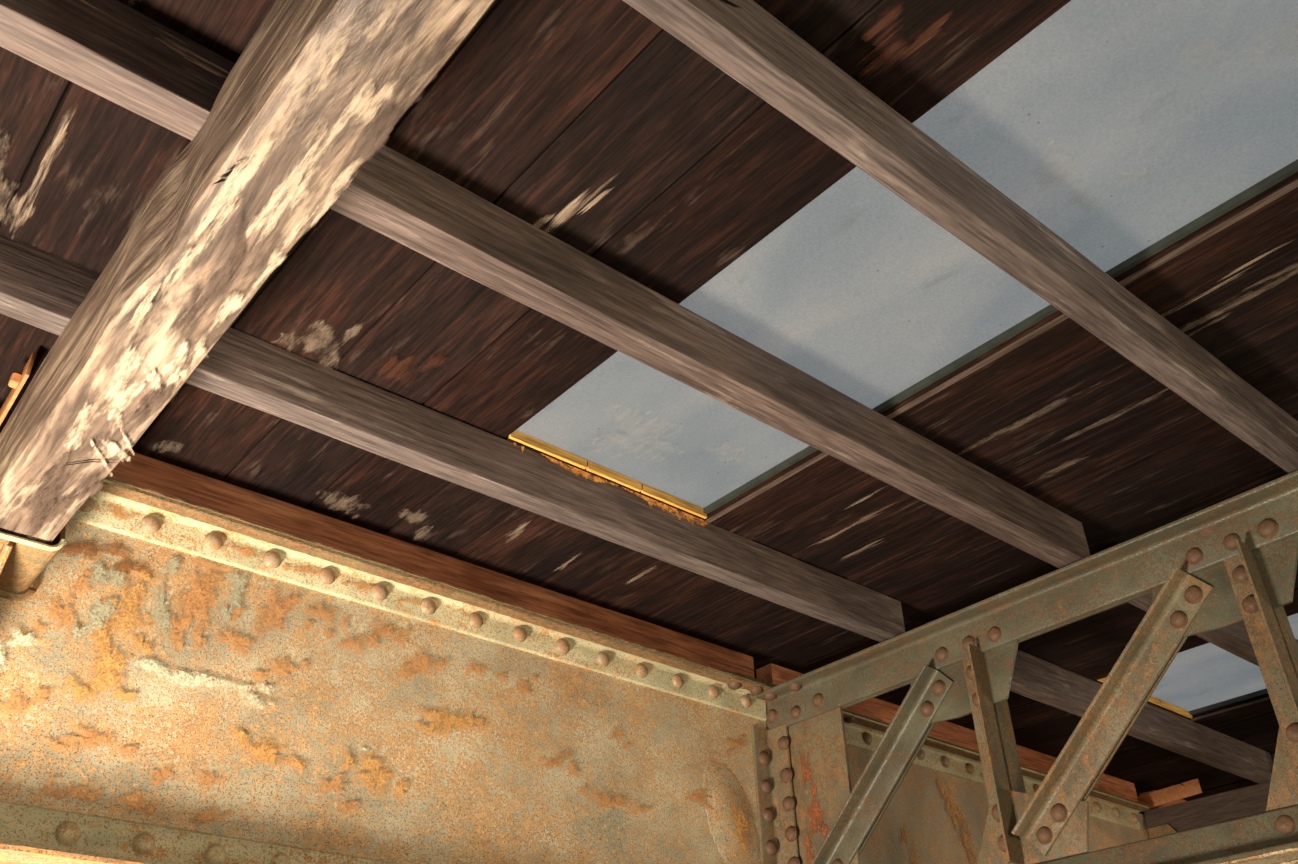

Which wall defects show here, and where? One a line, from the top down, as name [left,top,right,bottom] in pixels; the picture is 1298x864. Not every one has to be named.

rust [94,481,769,695]
rust [0,540,447,713]
rust [41,725,137,756]
rust [119,767,177,815]
rust [232,727,310,771]
rust [318,749,409,813]
rust [414,709,486,738]
rust [799,753,828,864]
rust [843,713,888,732]
rust [924,739,983,776]